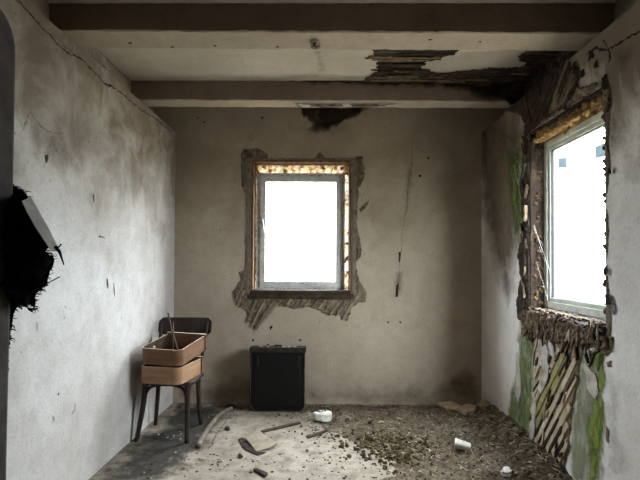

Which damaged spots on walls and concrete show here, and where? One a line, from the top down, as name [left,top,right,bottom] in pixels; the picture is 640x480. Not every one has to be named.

crack [16,0,172,132]
damp [301,107,362,131]
peeling [507,51,611,152]
crack [586,30,640,65]
spalling [233,147,370,330]
flaking render [516,309,614,467]
damp [588,350,605,480]